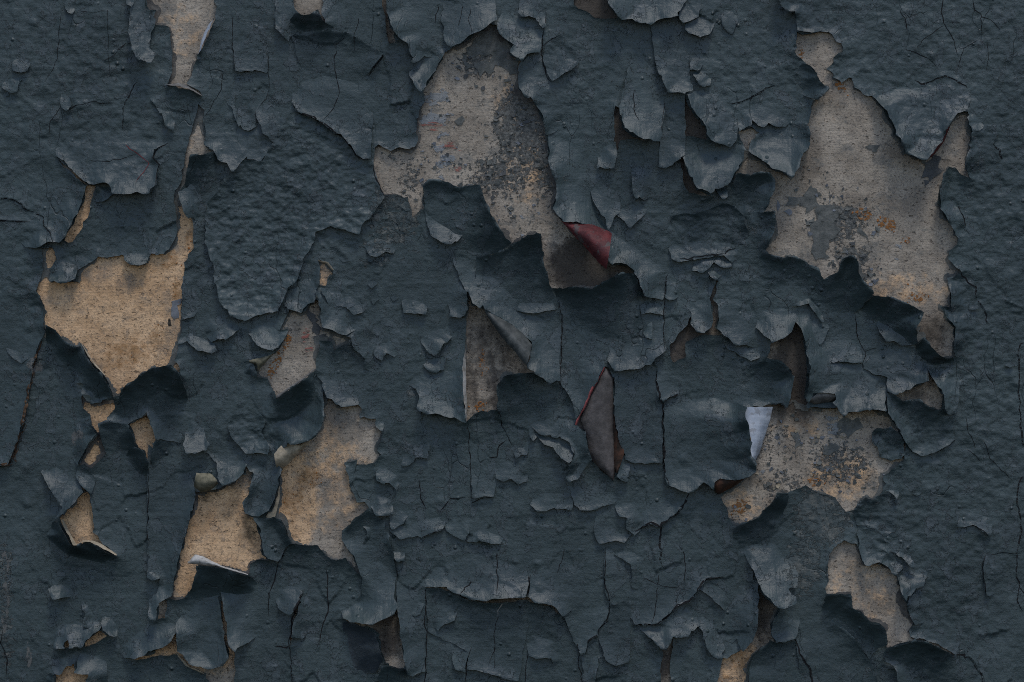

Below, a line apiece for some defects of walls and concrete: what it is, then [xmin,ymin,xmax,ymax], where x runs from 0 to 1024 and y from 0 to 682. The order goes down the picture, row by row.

peeling [0,0,729,682]
peeling [371,0,1000,682]
crack [316,570,329,649]
crack [422,589,430,682]
crack [465,554,502,682]
crack [577,552,614,681]